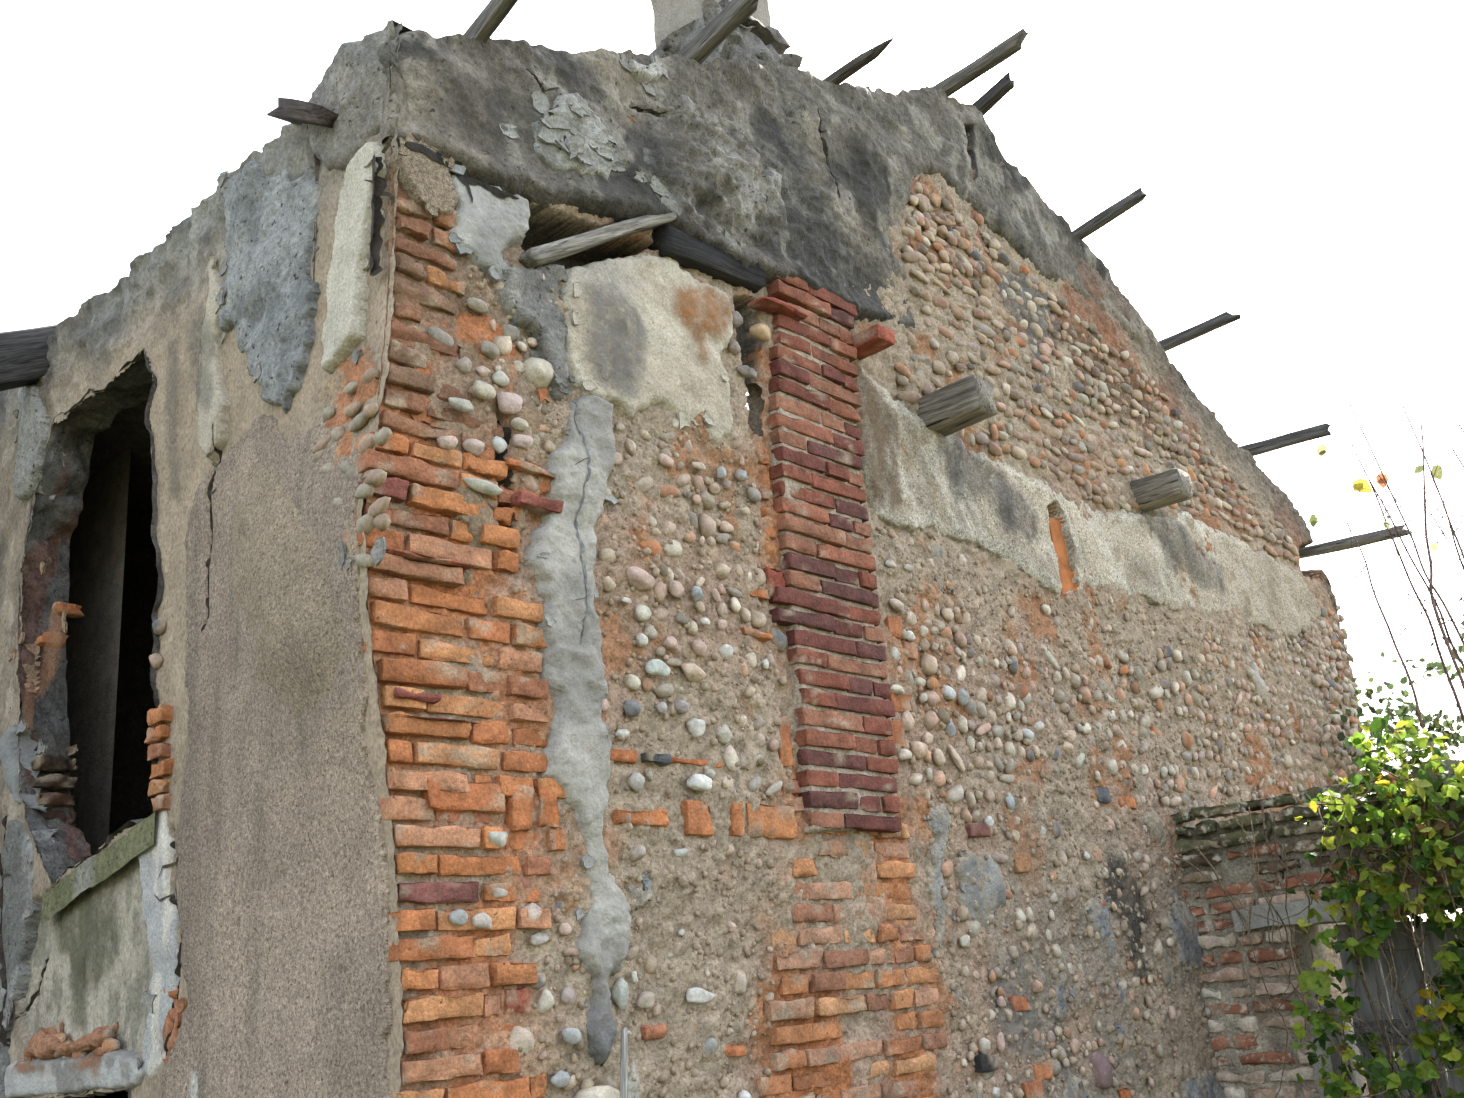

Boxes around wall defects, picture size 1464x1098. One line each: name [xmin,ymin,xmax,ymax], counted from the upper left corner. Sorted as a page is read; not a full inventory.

flaking render [13,385,67,501]
flaking render [197,133,733,577]
spalling [8,602,84,694]
flaking render [0,719,120,1098]
flaking render [137,810,187,1079]